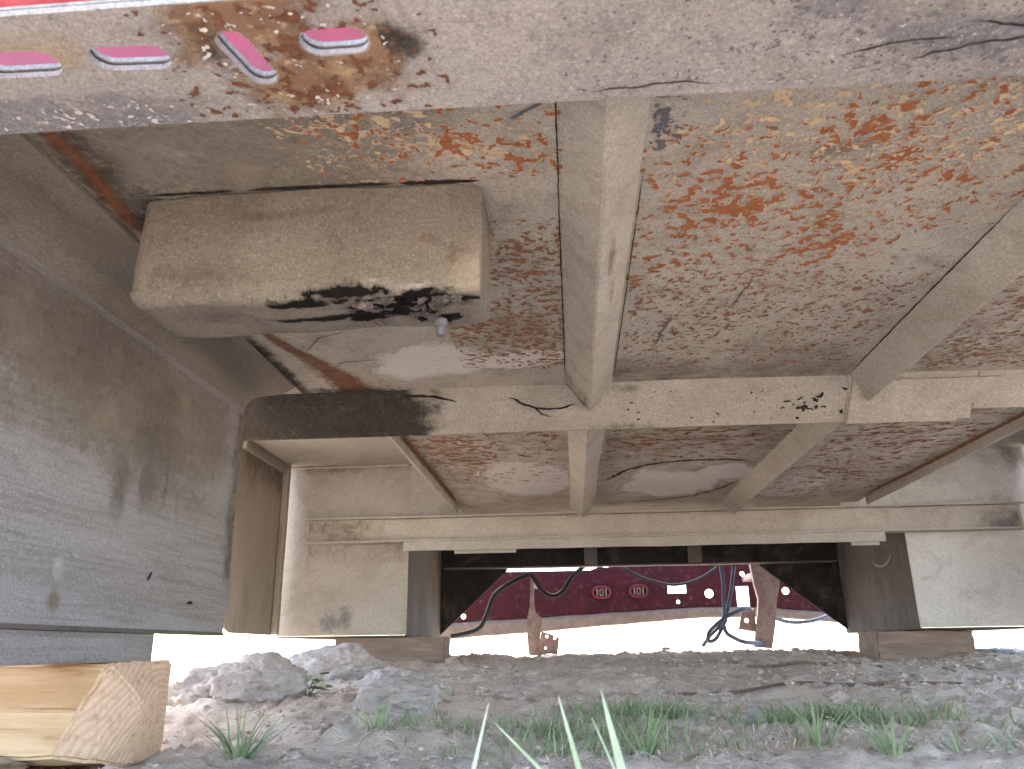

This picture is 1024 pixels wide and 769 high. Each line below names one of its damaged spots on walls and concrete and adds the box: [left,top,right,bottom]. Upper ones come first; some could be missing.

corrosion [160,0,563,184]
corrosion [38,132,152,234]
crack [510,102,565,372]
corrosion [619,77,1024,370]
corrosion [448,218,565,371]
corrosion [249,332,395,394]
corrosion [400,431,566,504]
crack [510,398,575,417]
corrosion [603,424,796,467]
spalling [771,386,826,419]
corrosion [757,408,1024,498]